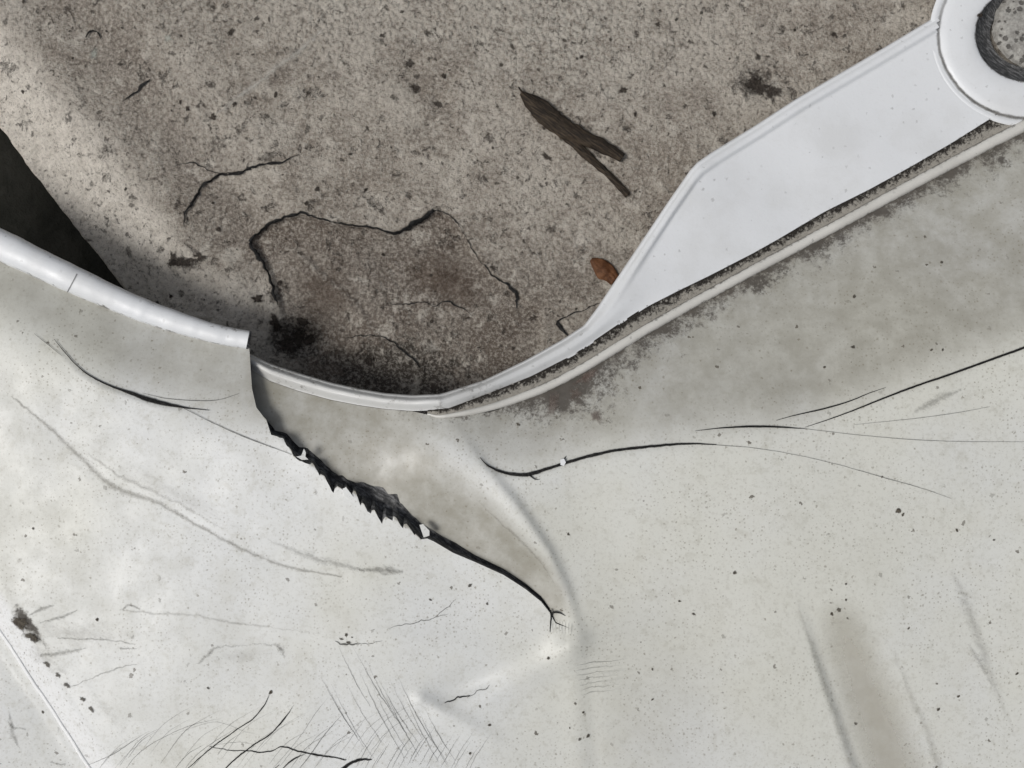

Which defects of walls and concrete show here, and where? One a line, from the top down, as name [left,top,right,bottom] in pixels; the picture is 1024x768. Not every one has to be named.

crack [182,154,299,227]
crack [248,208,519,308]
crack [35,334,289,454]
crack [481,347,1024,497]